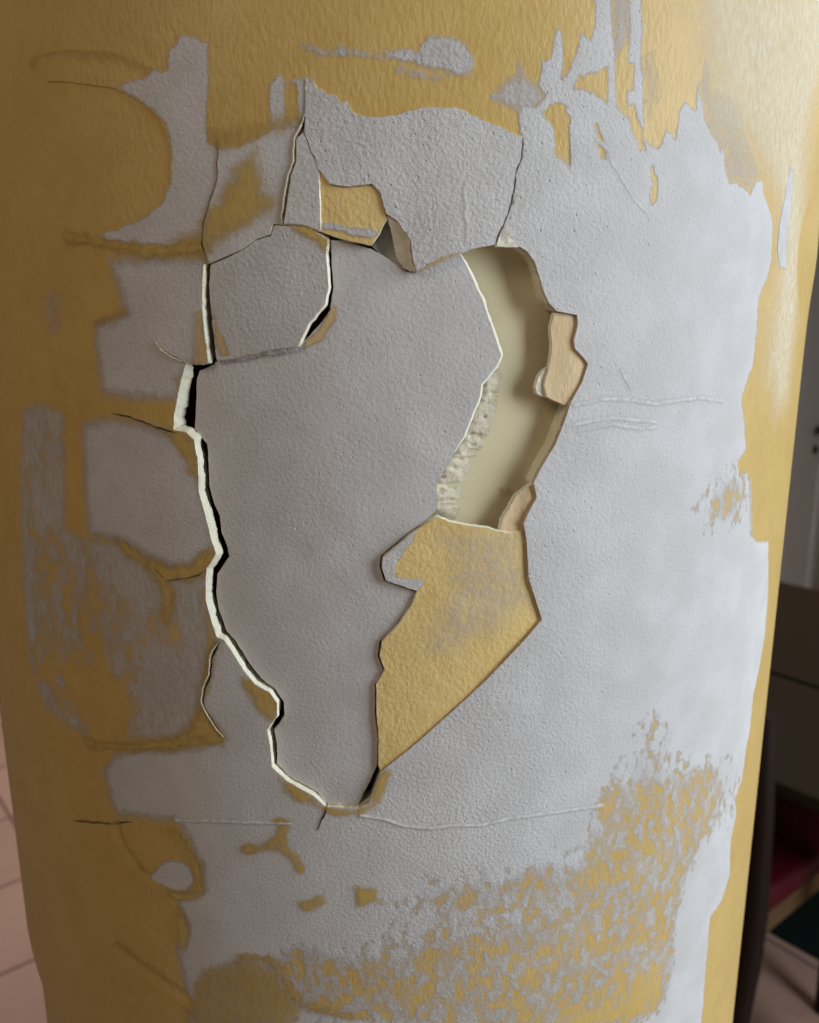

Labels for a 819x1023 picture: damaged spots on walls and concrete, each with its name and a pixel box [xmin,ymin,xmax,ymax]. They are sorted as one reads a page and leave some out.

crack [200,140,219,262]
crack [281,115,314,223]
crack [496,142,524,240]
spalling [173,133,586,808]
crack [200,640,224,737]